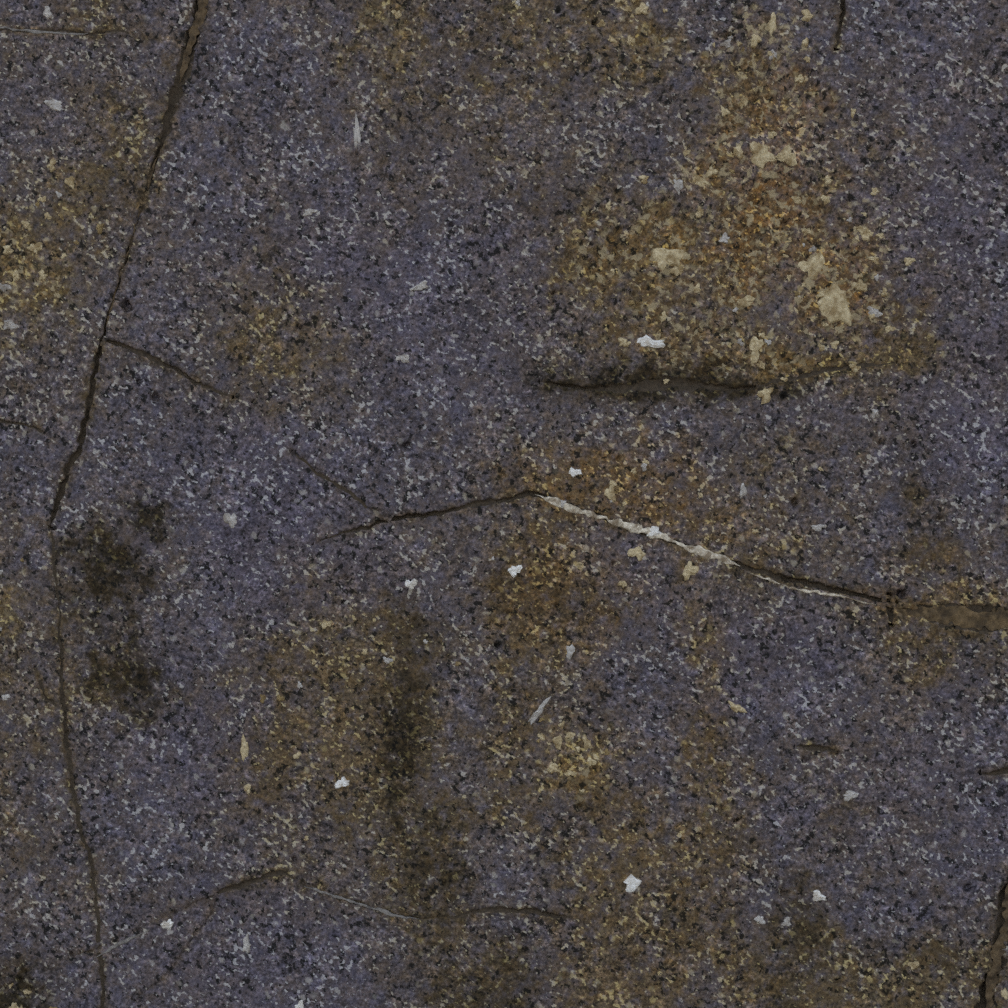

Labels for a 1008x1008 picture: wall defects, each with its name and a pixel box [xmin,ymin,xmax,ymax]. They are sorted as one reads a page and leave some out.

crack [540,358,896,396]
crack [0,0,760,1008]
crack [290,449,1008,639]
crack [980,765,1008,779]
crack [971,872,1008,1008]